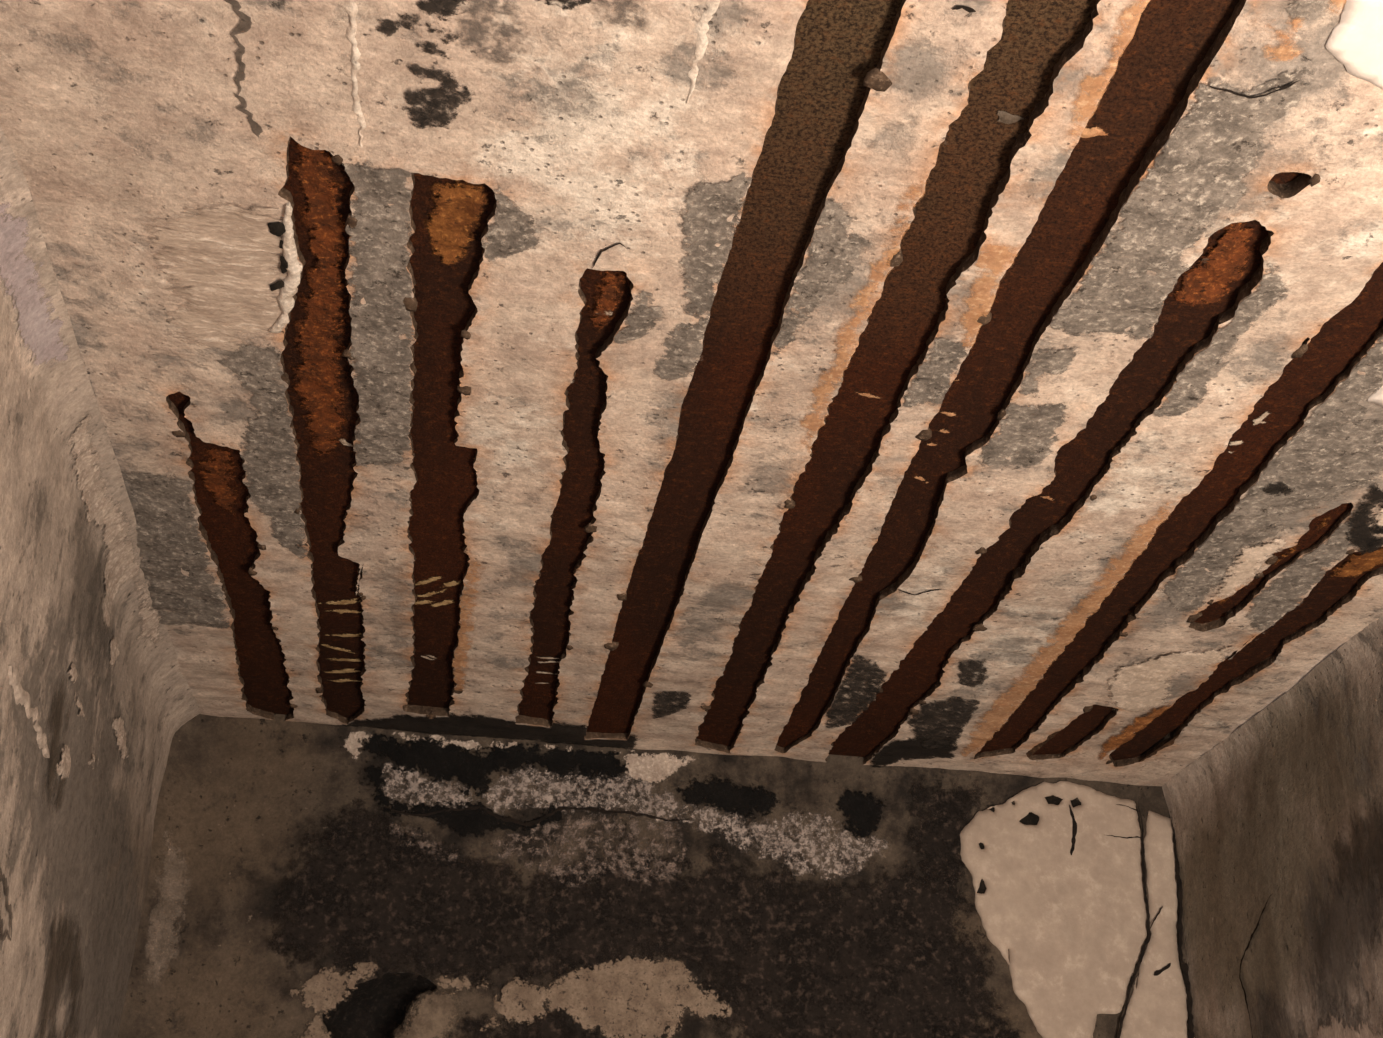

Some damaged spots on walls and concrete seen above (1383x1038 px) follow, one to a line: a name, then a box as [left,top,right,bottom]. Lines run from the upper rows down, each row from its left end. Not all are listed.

crack [224,0,263,137]
rust [1071,0,1150,135]
flaking render [1285,0,1383,90]
rust [961,244,1017,347]
spalling [695,0,1321,765]
rust [961,503,1171,760]
water stain [344,731,372,760]
water stain [391,732,517,750]
water stain [382,750,887,885]
crack [0,869,13,942]
crack [1070,801,1195,1038]
flaking render [1317,1015,1383,1038]